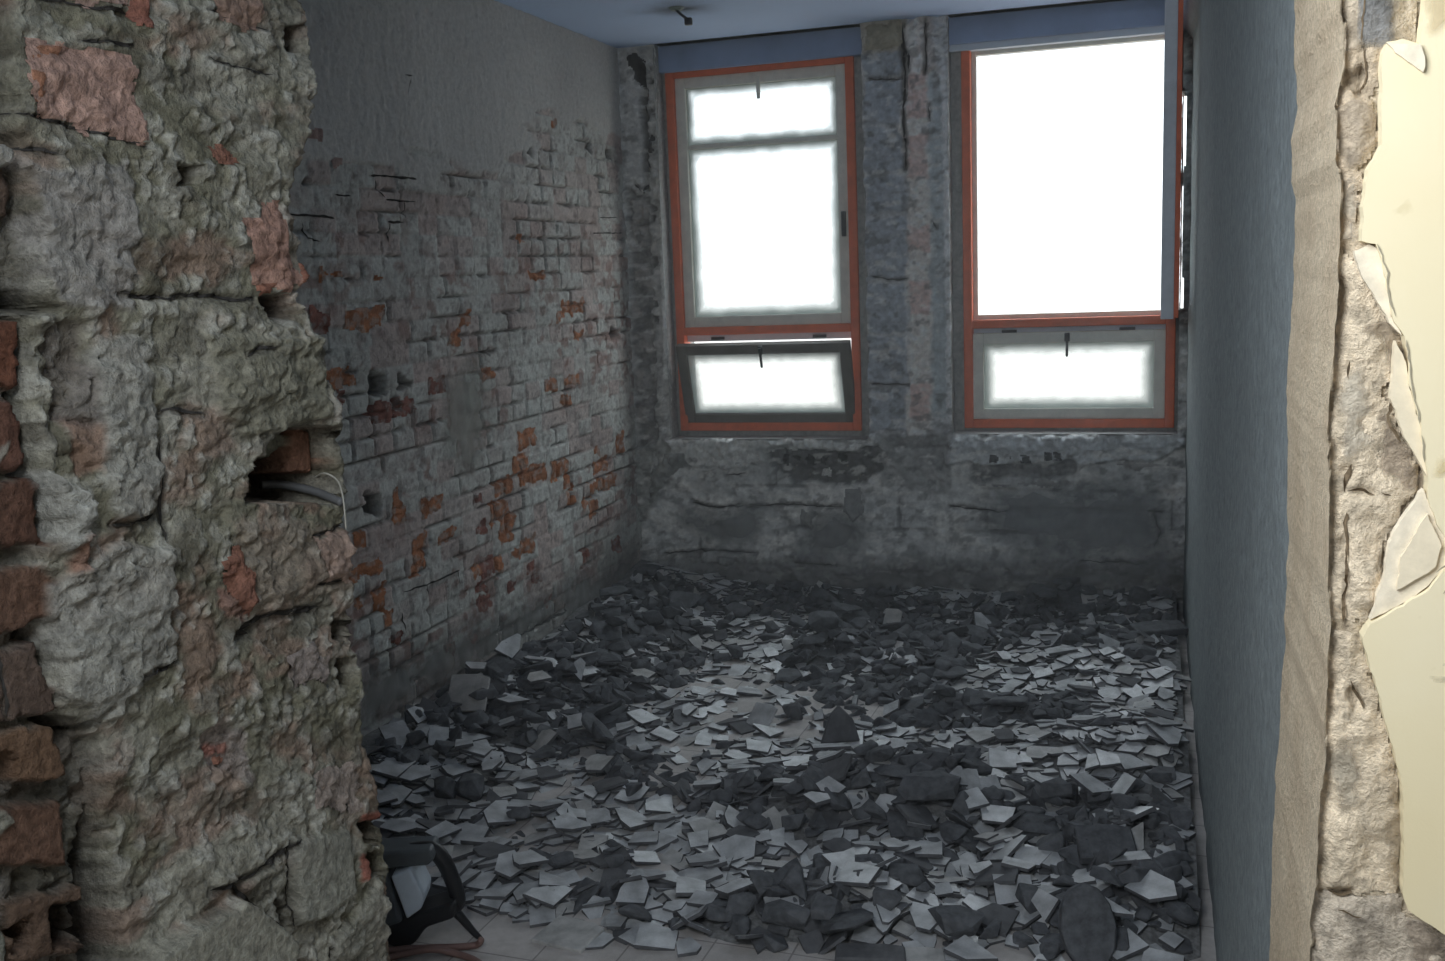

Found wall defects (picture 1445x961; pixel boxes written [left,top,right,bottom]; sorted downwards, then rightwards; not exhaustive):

flaking render [24,37,149,146]
crack [870,22,930,168]
crack [120,290,254,302]
spalling [309,304,385,335]
spalling [556,297,585,341]
spalling [361,375,446,424]
spalling [391,487,457,580]
spalling [471,427,625,613]
flaking render [1310,0,1445,961]
crack [236,579,343,635]
flaking render [312,529,403,646]
crack [145,661,175,678]